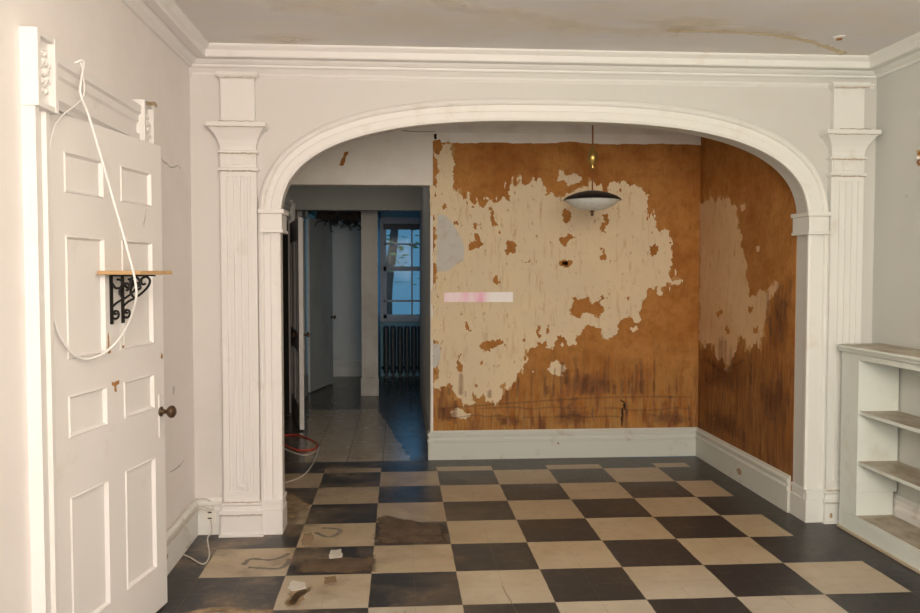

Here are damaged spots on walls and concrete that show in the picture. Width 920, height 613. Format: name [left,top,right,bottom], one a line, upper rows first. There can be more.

peeling [559,208,575,247]
peeling [504,240,517,255]
peeling [536,325,550,350]
peeling [479,339,506,365]